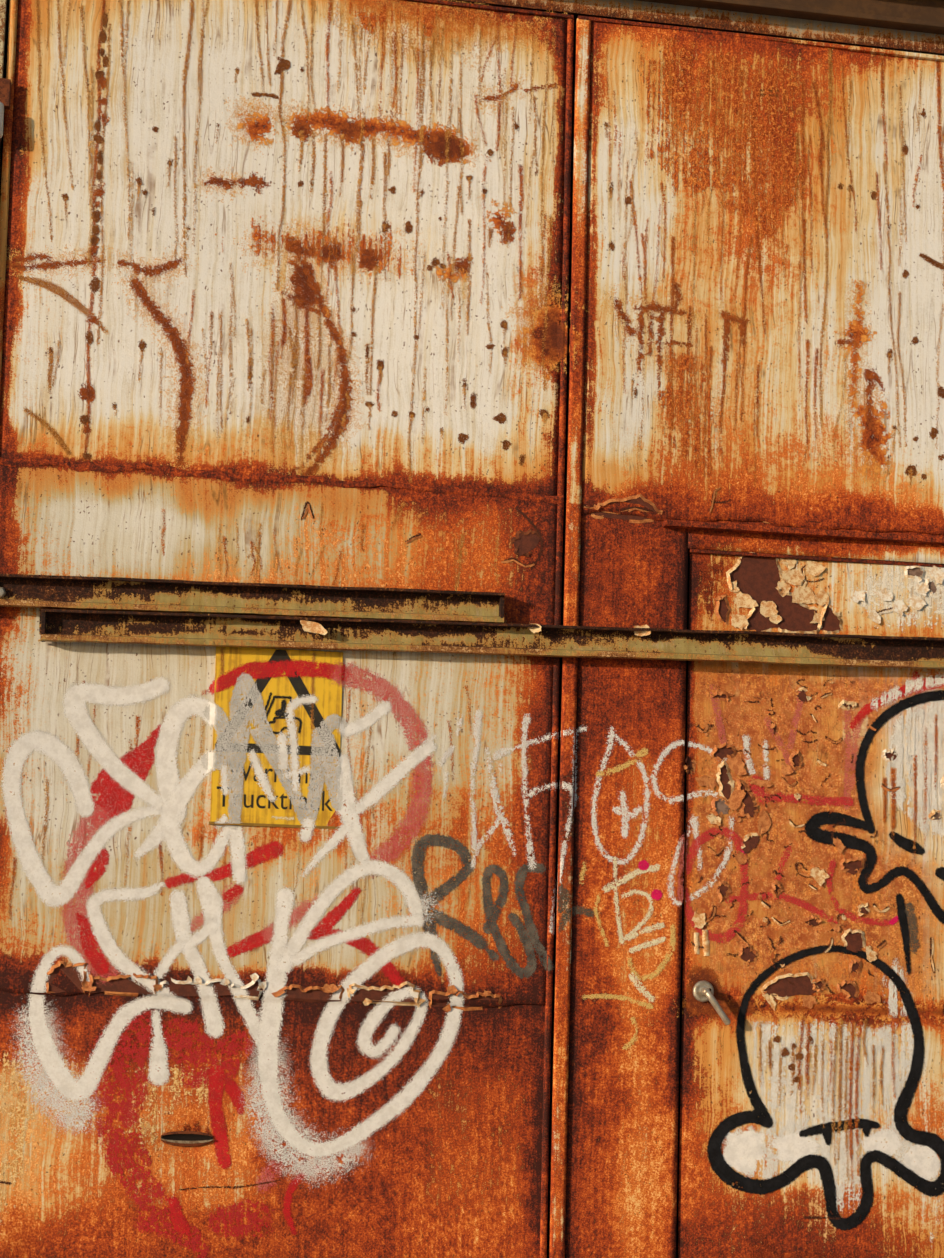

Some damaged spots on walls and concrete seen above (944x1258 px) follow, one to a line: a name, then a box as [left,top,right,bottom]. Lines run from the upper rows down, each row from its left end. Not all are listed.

corrosion [16,0,944,495]
corrosion [217,502,343,586]
peeling [699,552,843,634]
peeling [842,565,944,633]
peeling [711,691,733,702]
peeling [796,687,811,703]
peeling [838,699,857,711]
peeling [684,742,803,865]
peeling [810,838,864,886]
peeling [715,880,731,903]
peeling [692,912,706,929]
peeling [738,944,758,964]